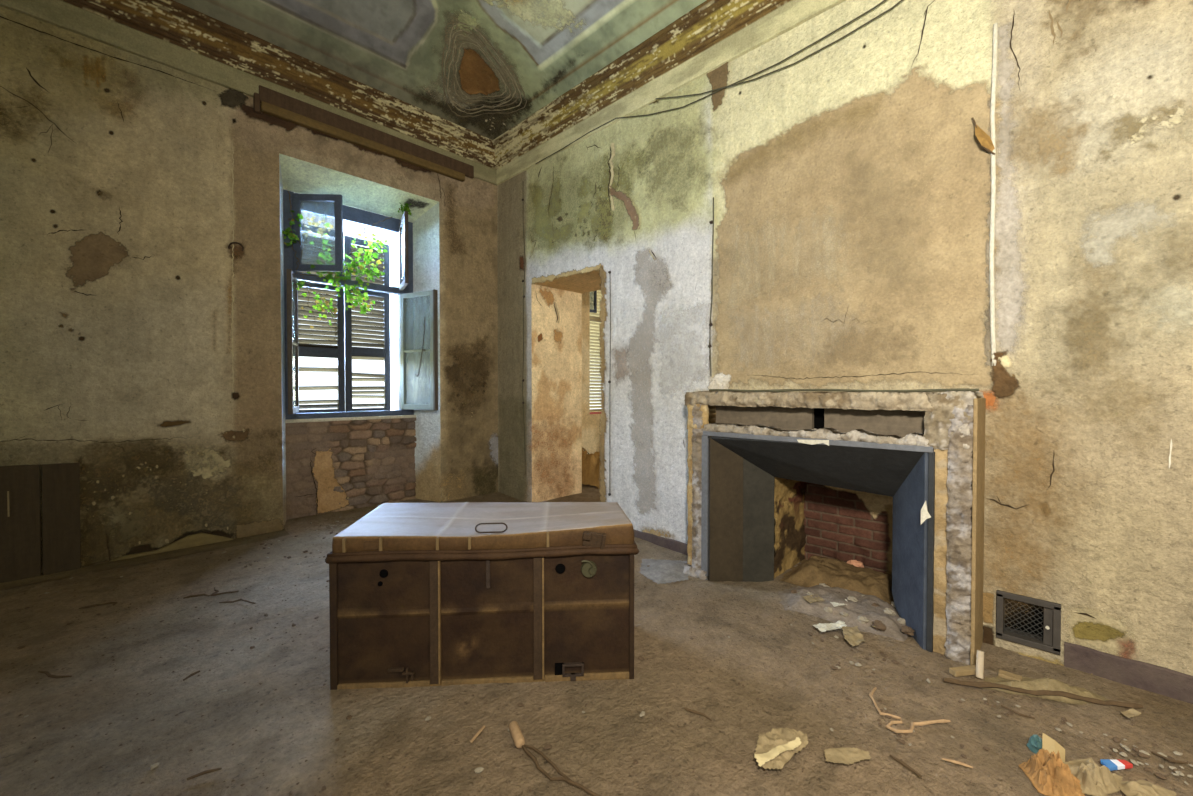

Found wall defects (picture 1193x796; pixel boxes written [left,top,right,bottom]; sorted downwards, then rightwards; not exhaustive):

damp [414,12,575,139]
crack [1010,12,1020,89]
damp [1048,0,1104,44]
spalling [219,88,433,173]
damp [1016,105,1087,174]
spalling [47,207,151,296]
peeling [707,62,1020,398]
peeling [627,249,671,514]
damp [79,434,286,565]